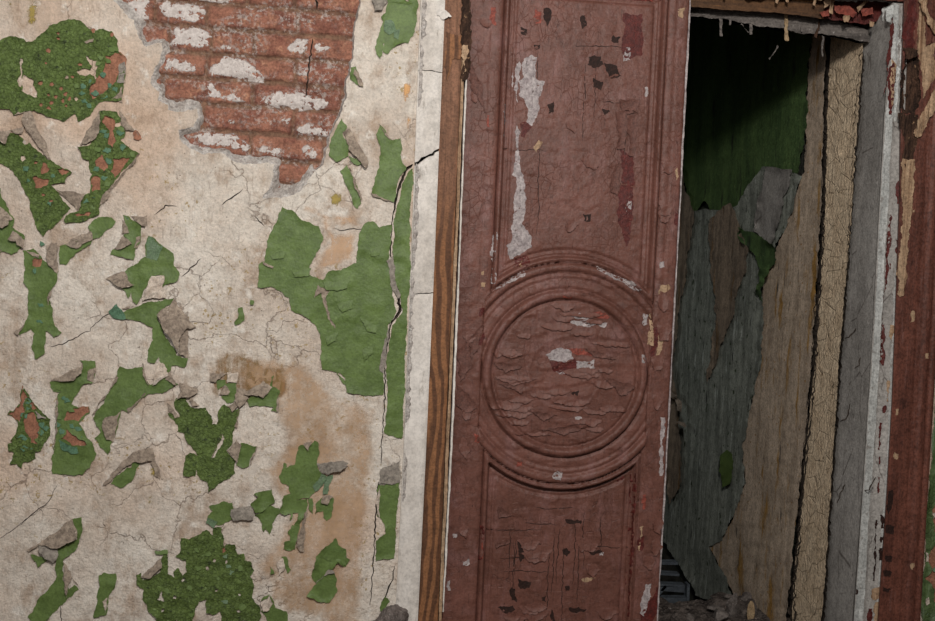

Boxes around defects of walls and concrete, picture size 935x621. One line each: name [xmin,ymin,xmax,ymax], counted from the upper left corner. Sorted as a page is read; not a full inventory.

peeling [0,19,280,492]
flaking render [113,0,419,439]
crack [305,39,313,96]
crack [390,164,413,257]
peeling [481,55,545,290]
peeling [615,7,812,621]
crack [1,484,58,538]
peeling [27,517,83,621]
peeling [136,441,350,621]
water stain [248,363,369,612]
crack [370,294,402,602]
peeling [375,461,400,561]